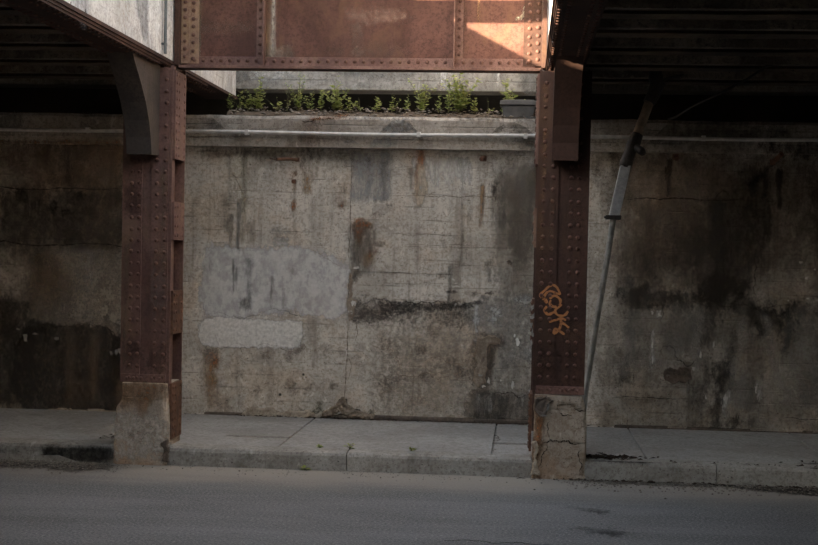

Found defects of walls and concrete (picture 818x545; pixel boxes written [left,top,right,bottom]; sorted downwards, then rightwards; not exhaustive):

leakage [0,298,169,463]
leakage [198,233,350,320]
crack [210,168,534,405]
leakage [619,273,805,352]